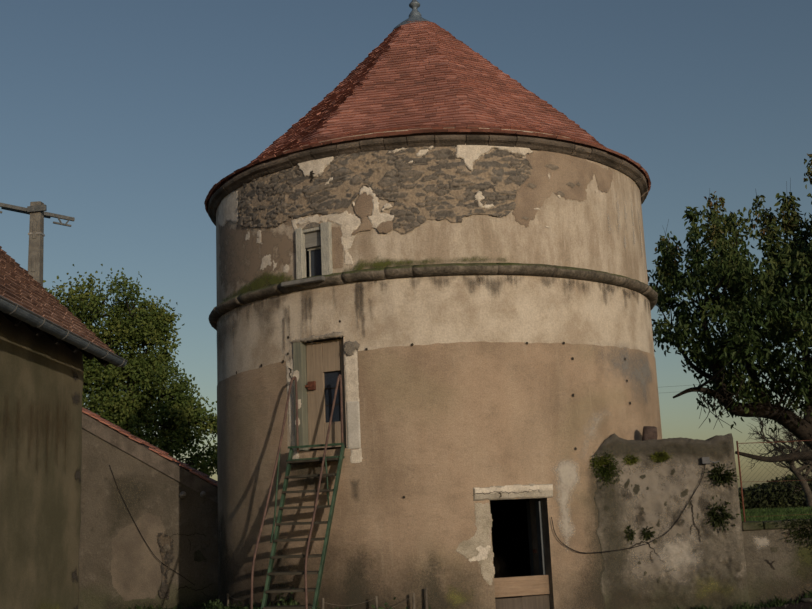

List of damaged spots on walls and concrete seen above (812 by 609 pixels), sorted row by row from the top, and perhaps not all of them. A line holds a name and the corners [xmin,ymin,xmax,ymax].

flaking render [218,142,613,290]
leakage [356,283,364,320]
flaking render [456,502,495,585]